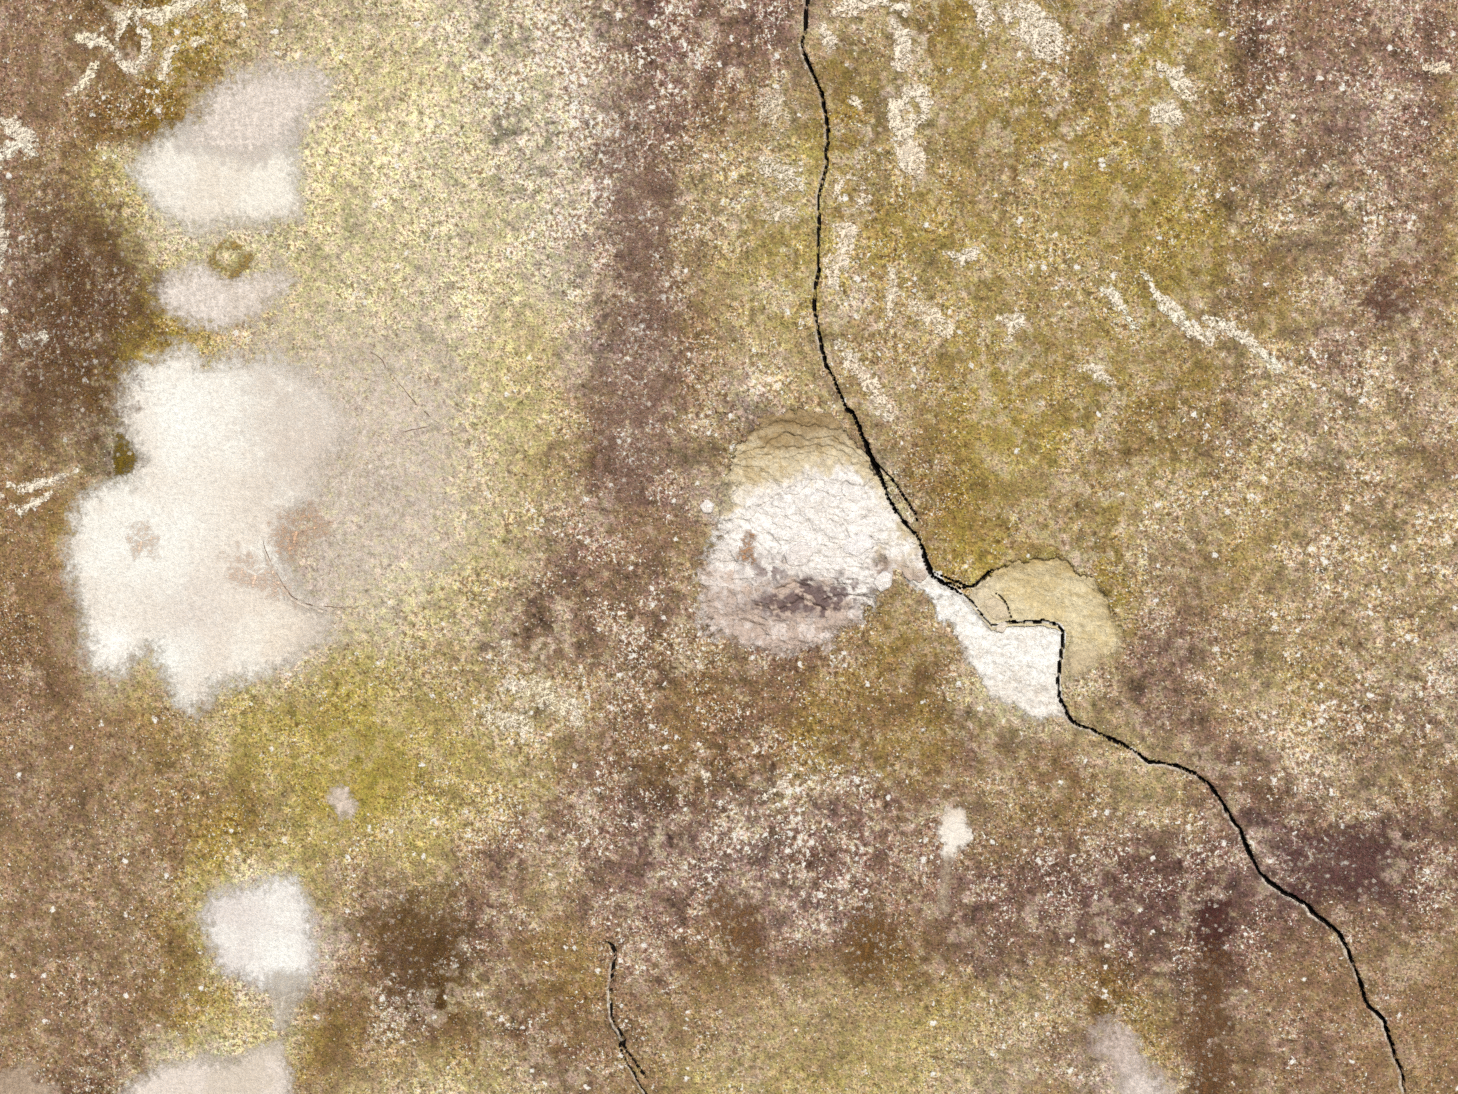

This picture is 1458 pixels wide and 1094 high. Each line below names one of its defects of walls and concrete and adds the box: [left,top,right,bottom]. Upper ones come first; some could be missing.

leakage [209,239,253,279]
spalling [694,407,1123,720]
crack [800,0,1406,1093]
crack [605,941,647,1094]